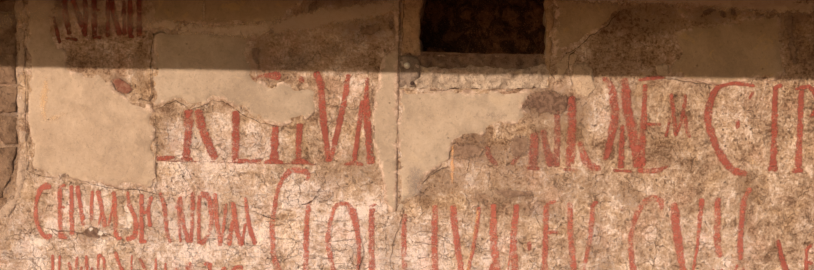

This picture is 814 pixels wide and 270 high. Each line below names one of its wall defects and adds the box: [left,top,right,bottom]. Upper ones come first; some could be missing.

flaking render [112,78,132,93]
crack [86,32,279,193]
flaking render [522,90,580,115]